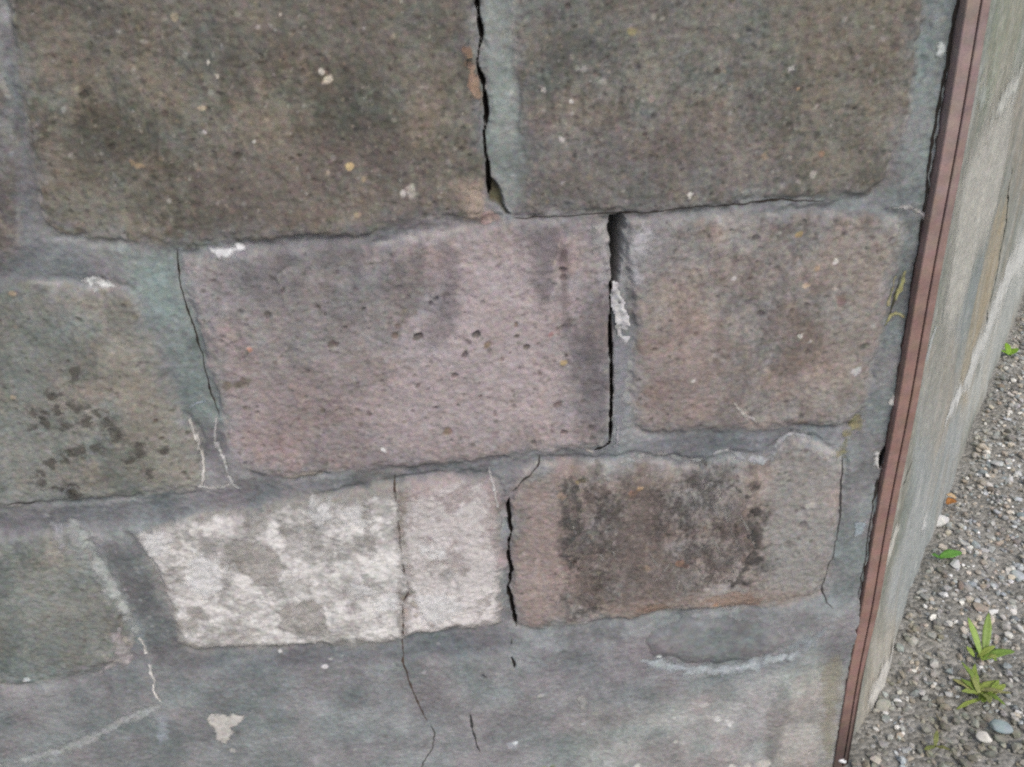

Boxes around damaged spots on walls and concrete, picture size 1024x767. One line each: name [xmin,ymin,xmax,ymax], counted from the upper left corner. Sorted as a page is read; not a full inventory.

crack [475,0,491,192]
crack [177,250,220,418]
crack [594,280,613,450]
crack [374,477,436,767]
crack [507,455,540,668]
water stain [561,486,584,567]
water stain [728,480,765,588]